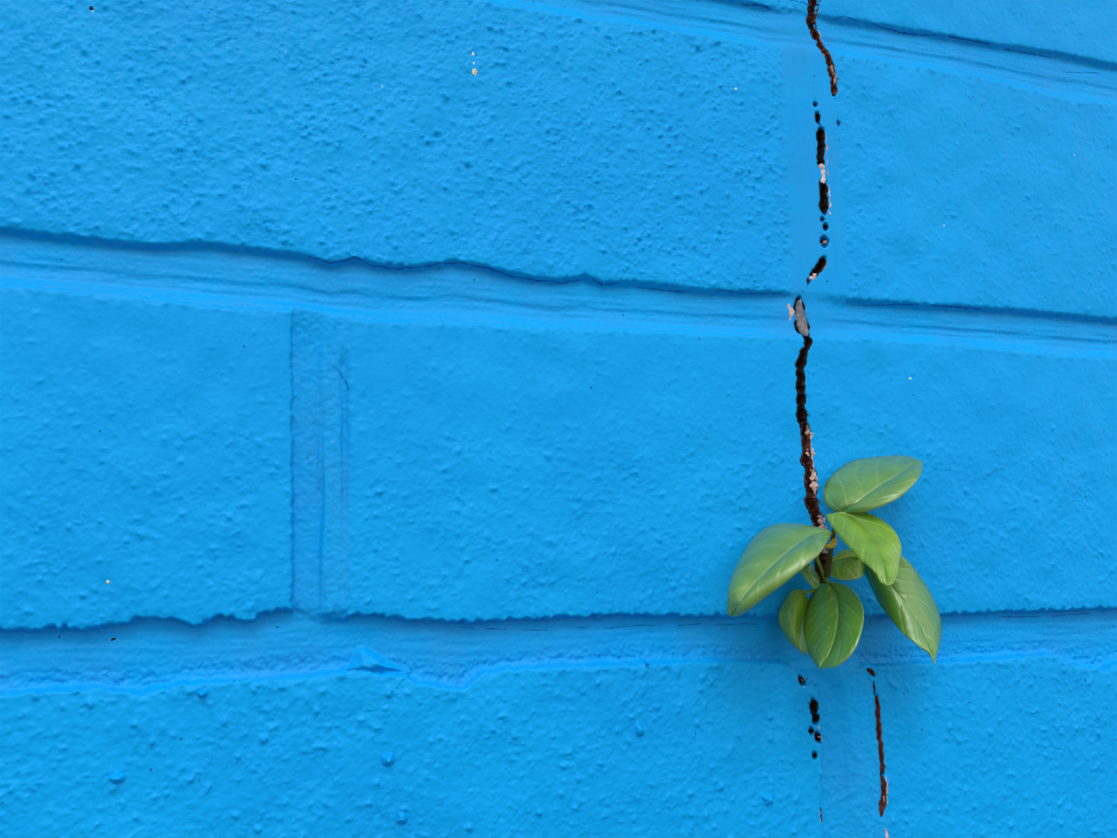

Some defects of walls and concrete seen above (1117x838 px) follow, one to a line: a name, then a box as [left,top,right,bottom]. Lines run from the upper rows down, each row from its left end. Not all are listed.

crack [310,256,685,292]
crack [714,0,1098,583]
crack [798,676,822,758]
crack [859,667,889,838]